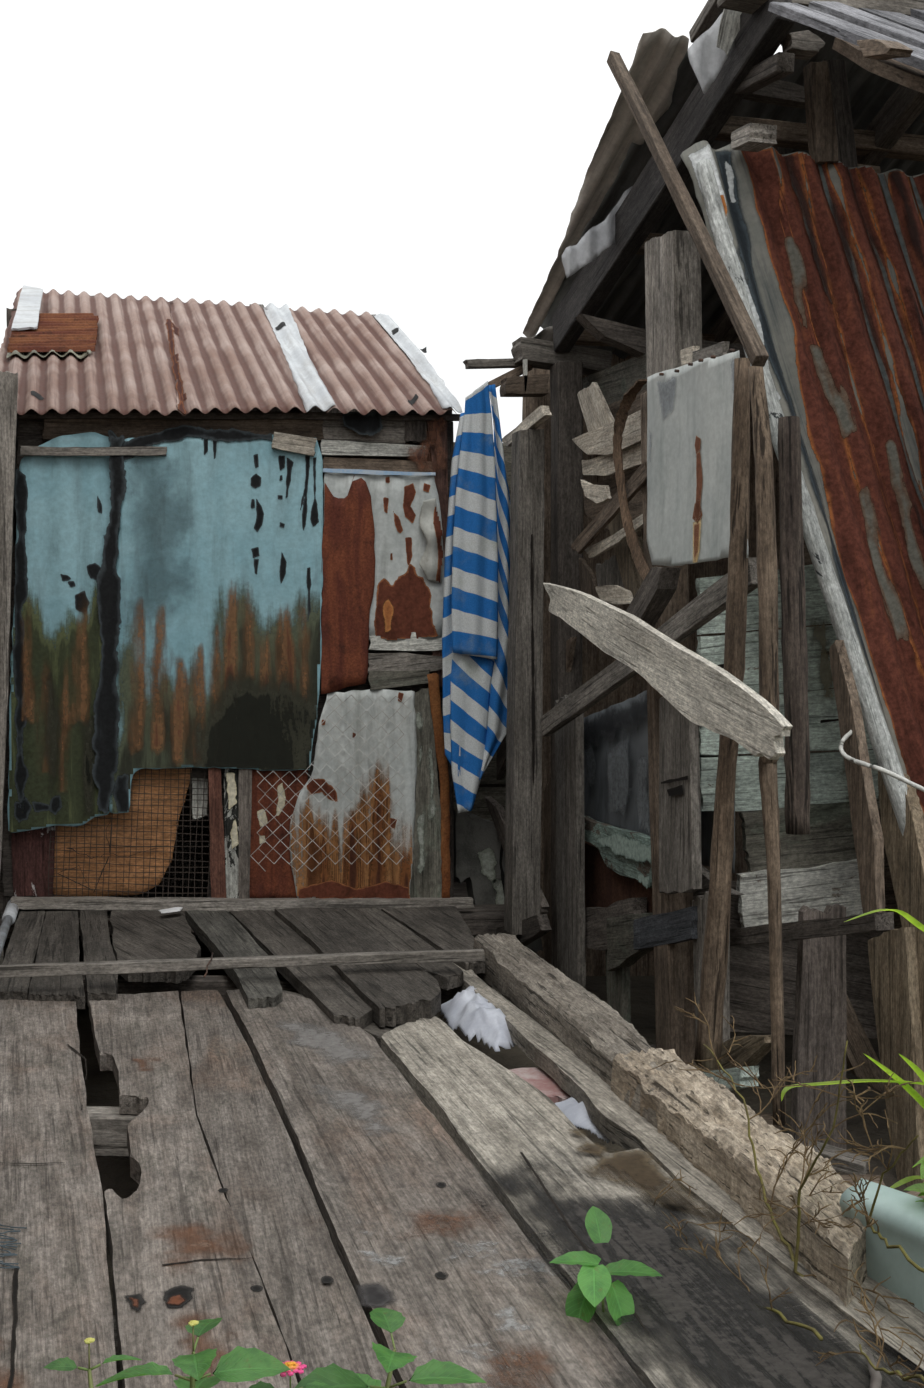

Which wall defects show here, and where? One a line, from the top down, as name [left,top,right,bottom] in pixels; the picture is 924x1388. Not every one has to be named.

corrosion [22,618,89,790]
damp [9,587,320,832]
corrosion [130,417,446,765]
corrosion [249,765,412,899]
corrosion [692,436,703,563]
corrosion [742,147,924,813]